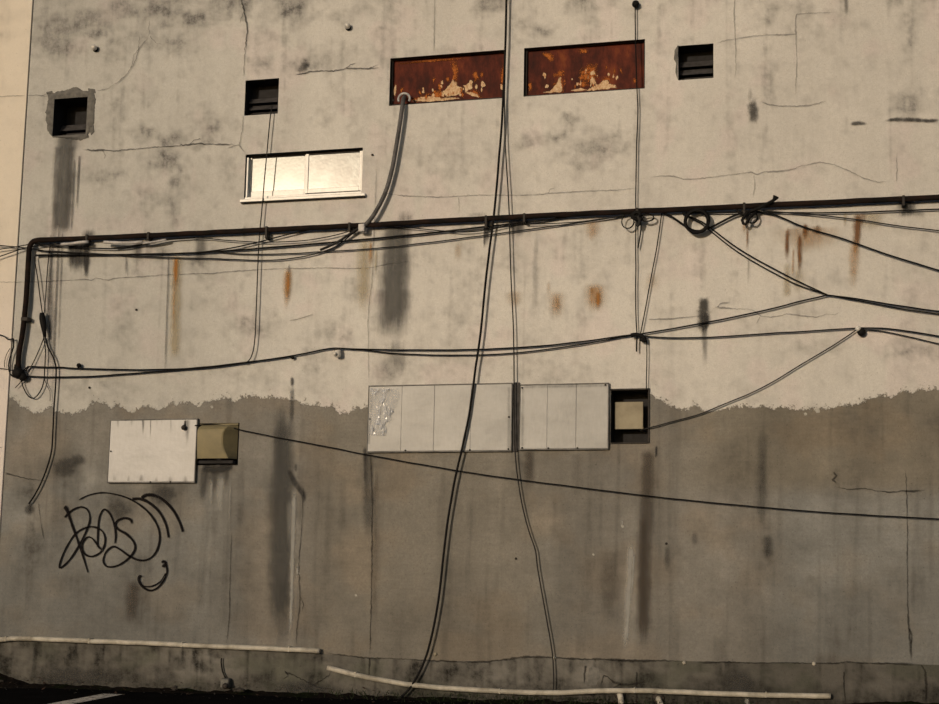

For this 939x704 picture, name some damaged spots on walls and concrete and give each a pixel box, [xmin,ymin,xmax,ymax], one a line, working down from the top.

crack [240,0,248,70]
crack [87,138,229,151]
leakage [48,137,92,356]
leakage [384,226,407,324]
leakage [699,299,708,329]
corrosion [785,225,819,265]
corrosion [853,216,863,254]
leakage [271,427,305,622]
flaking render [0,386,939,665]
leakage [625,447,657,639]
crack [706,472,927,698]